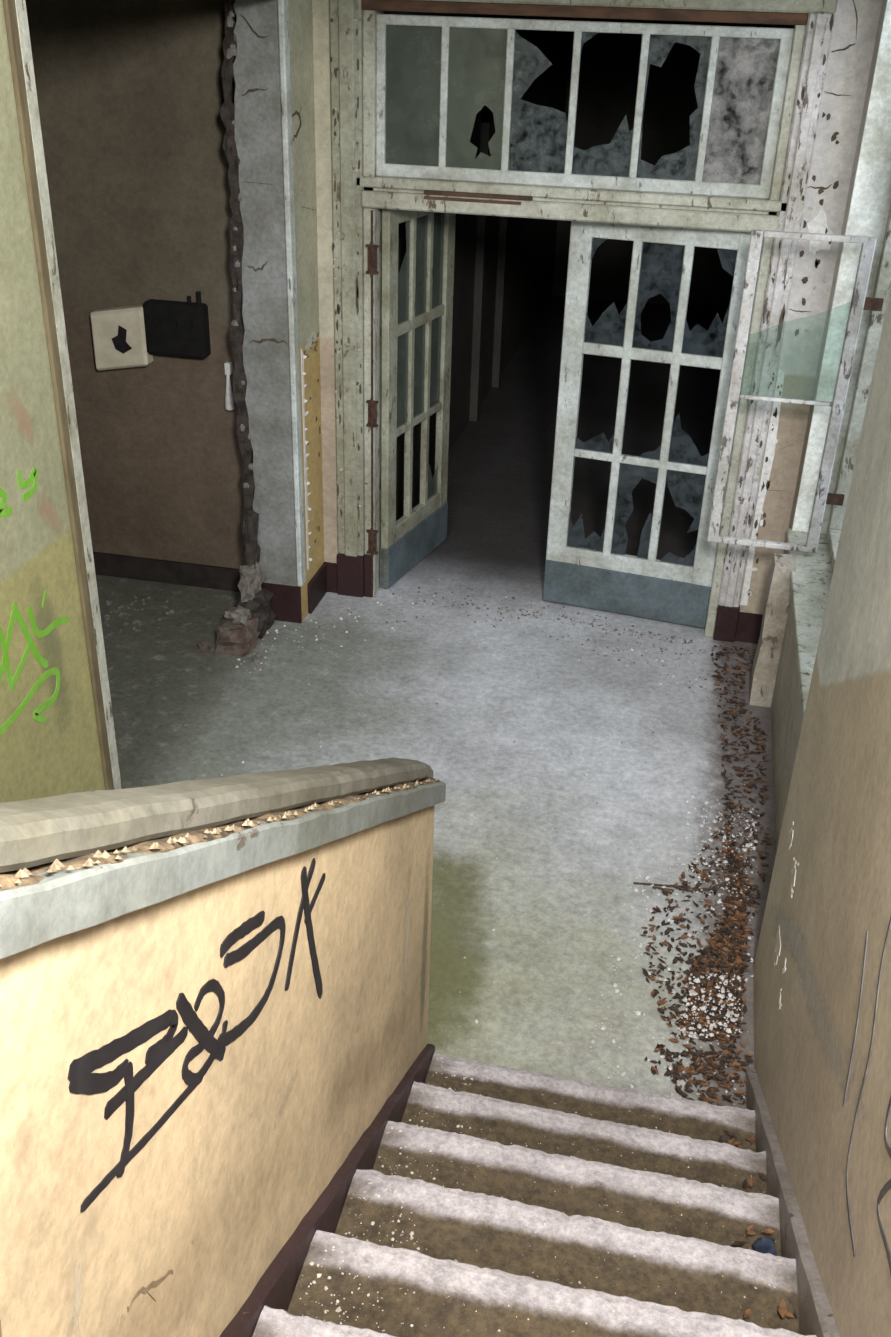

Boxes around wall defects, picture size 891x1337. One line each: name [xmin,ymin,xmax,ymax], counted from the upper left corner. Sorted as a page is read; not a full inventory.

peeling [797,88,839,144]
peeling [785,171,839,306]
spalling [196,0,276,663]
peeling [755,273,809,364]
peeling [726,368,785,606]
crack [127,1270,173,1312]